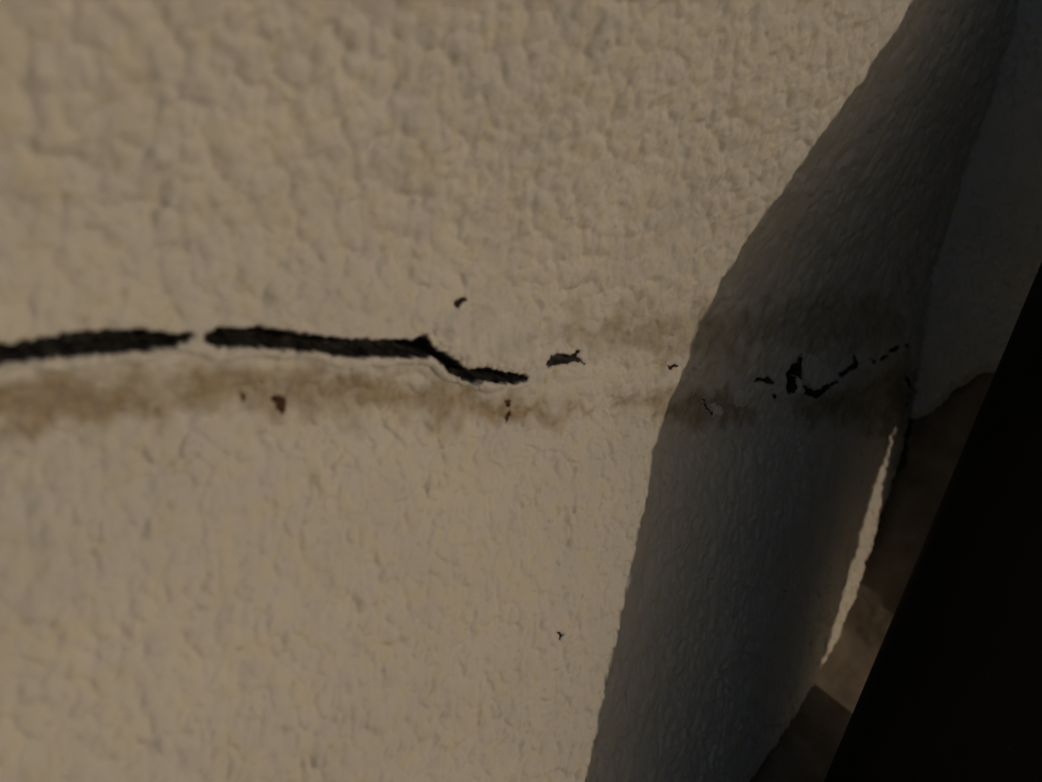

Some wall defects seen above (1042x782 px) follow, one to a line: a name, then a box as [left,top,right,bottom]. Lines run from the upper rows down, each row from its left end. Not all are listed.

crack [0,326,528,384]
crack [701,343,909,416]
crack [891,376,914,486]